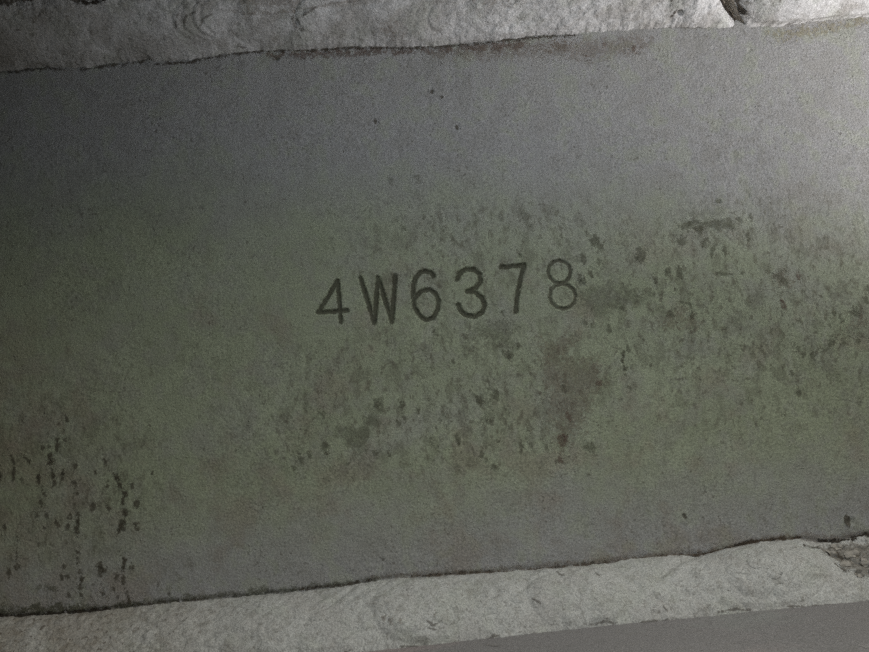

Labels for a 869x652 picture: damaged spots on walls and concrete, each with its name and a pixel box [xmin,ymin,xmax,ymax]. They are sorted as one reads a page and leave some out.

water stain [36,438,80,537]
water stain [106,472,140,534]
water stain [95,557,134,605]
peeling [803,543,869,577]